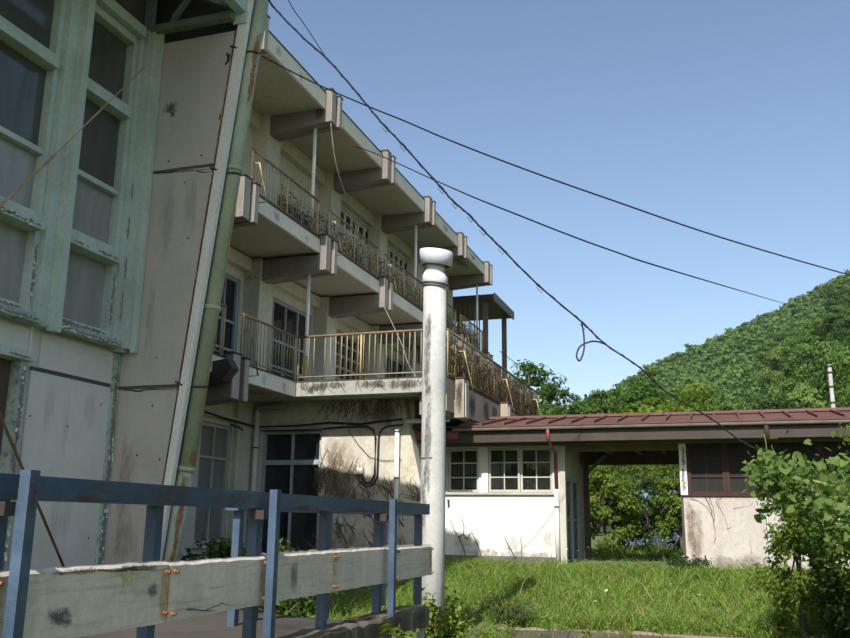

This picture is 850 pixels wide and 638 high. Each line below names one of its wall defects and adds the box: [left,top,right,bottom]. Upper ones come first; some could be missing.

rust [248,35,261,100]
peeling [62,250,127,345]
water stain [422,416,431,504]
rust [170,506,184,562]